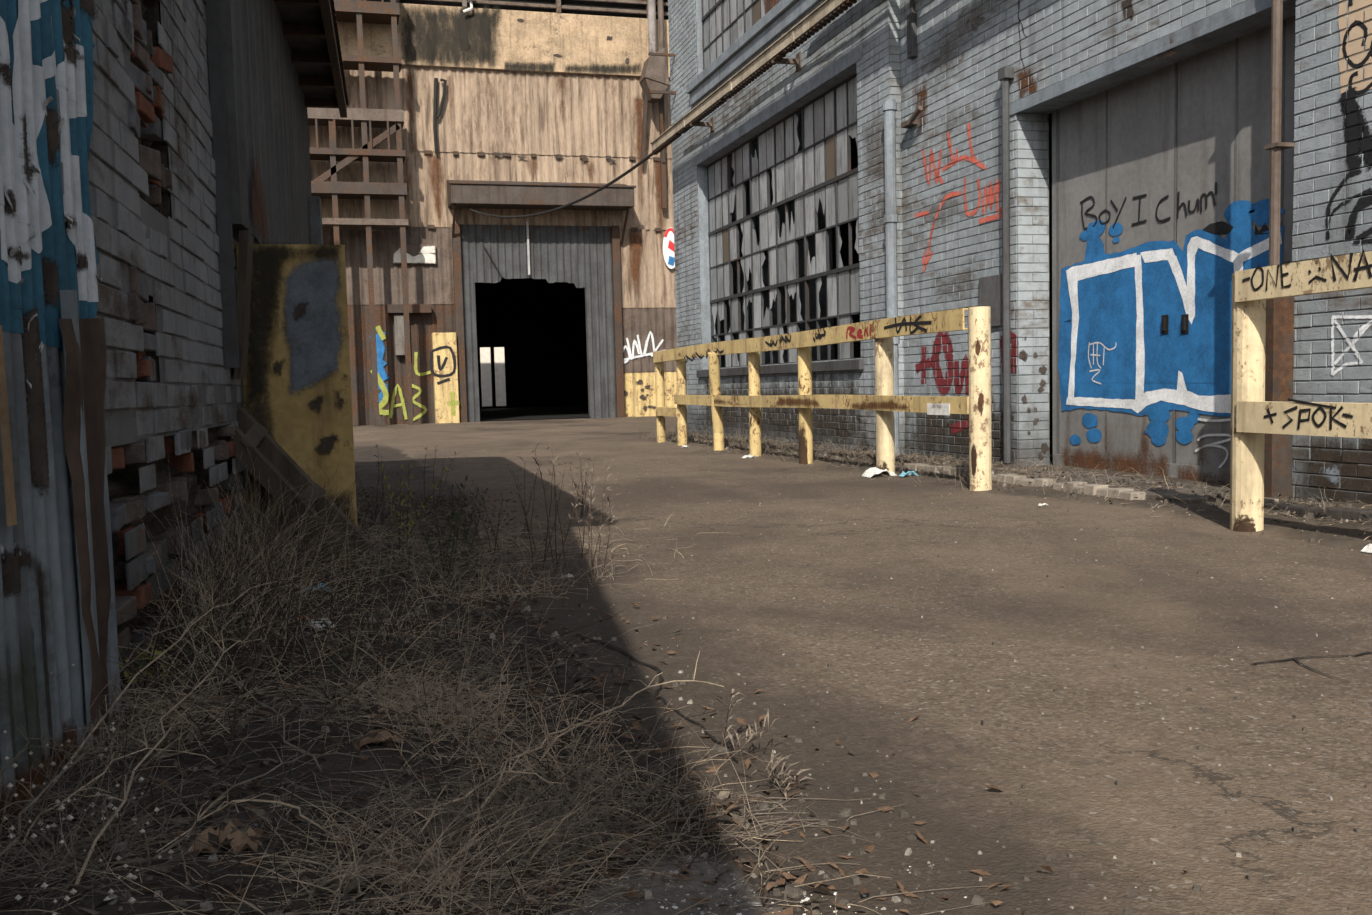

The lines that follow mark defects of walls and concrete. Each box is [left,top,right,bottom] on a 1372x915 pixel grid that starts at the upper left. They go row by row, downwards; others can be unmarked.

peeling [61,0,98,67]
water stain [400,7,641,74]
peeling [0,52,12,100]
rust [1017,69,1037,98]
spalling [128,0,173,219]
peeling [4,96,65,217]
peeling [77,253,102,282]
peeling [273,256,344,412]
peeling [314,433,339,455]
rust [1063,435,1229,485]
crack [1252,652,1372,681]